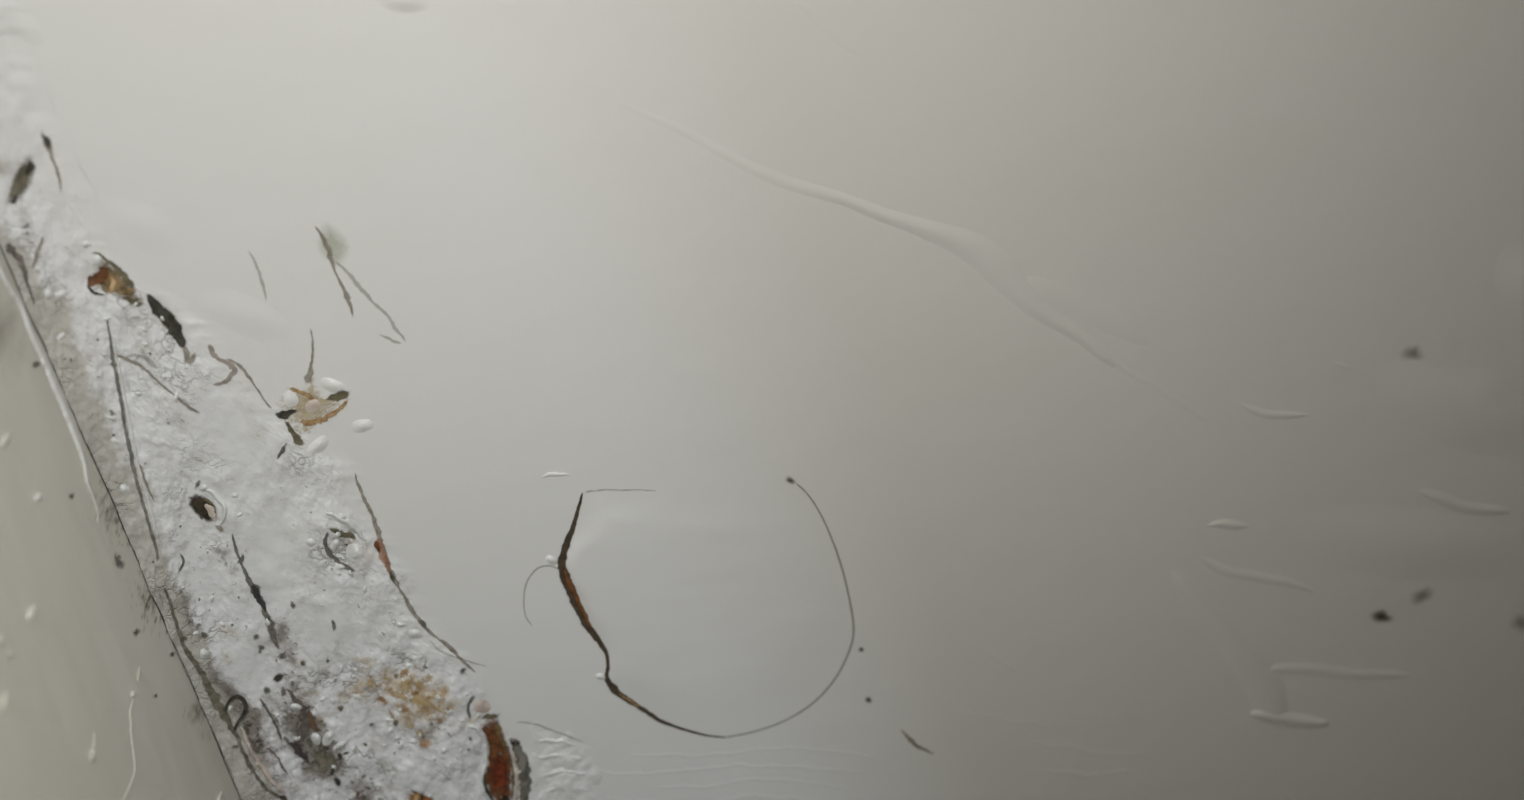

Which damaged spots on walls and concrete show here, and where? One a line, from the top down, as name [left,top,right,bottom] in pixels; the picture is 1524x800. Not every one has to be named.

corrosion [87,267,108,287]
flaking render [0,0,603,800]
crack [355,474,475,672]
leakage [311,731,349,786]